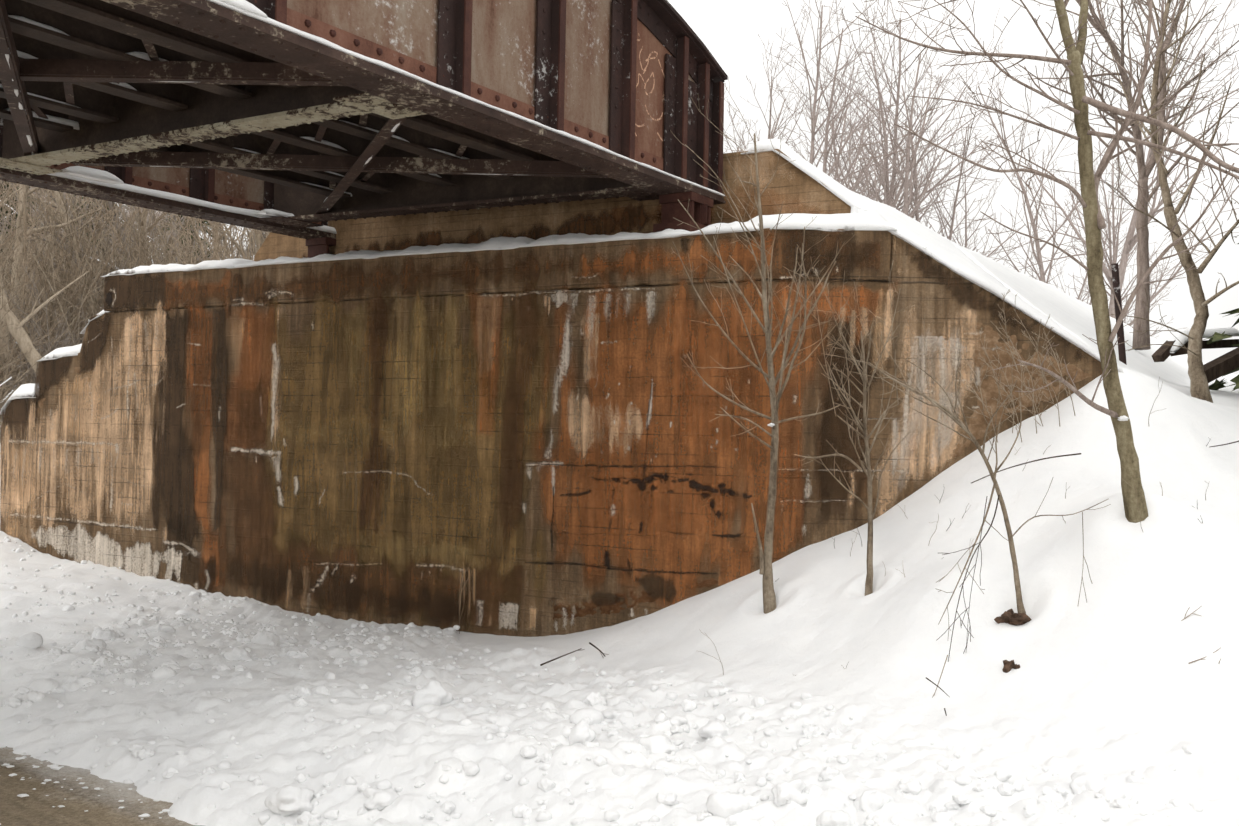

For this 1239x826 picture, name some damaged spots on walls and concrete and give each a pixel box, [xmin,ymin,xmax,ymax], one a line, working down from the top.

damp [0,271,536,633]
rust [164,232,867,605]
damp [485,275,655,537]
crack [525,463,752,574]
damp [805,314,874,517]
damp [879,253,1037,516]